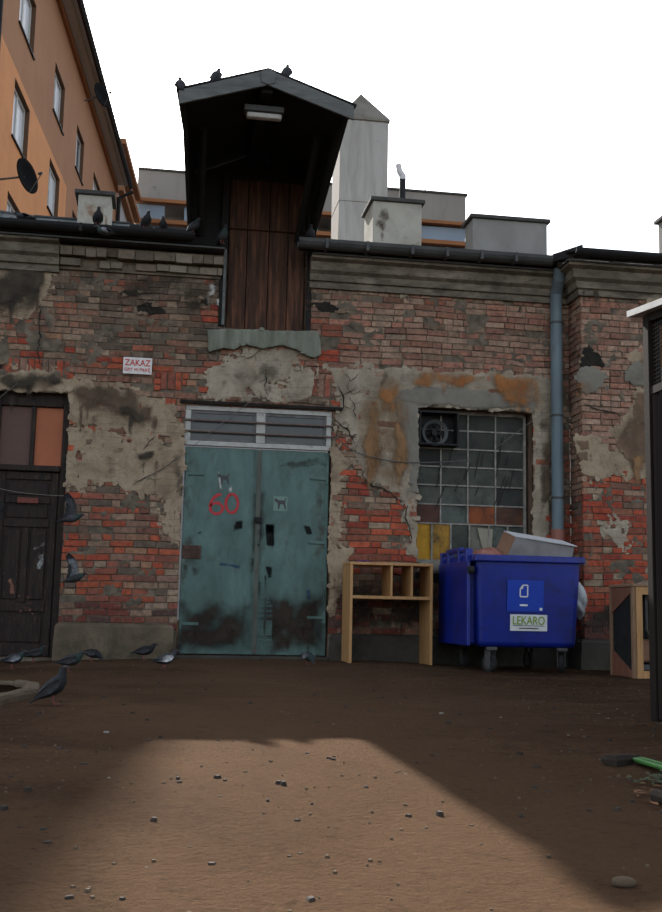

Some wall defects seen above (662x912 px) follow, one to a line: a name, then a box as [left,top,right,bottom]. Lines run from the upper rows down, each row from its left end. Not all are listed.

damp [0,269,44,317]
peeling [0,272,57,320]
spalling [118,289,166,316]
spalling [311,301,345,313]
damp [75,386,157,434]
rust [415,372,475,386]
rust [495,374,538,411]
spalling [578,345,605,367]
peeling [0,346,552,617]
flaking render [571,385,648,613]
rust [178,605,244,655]
rust [258,599,322,652]